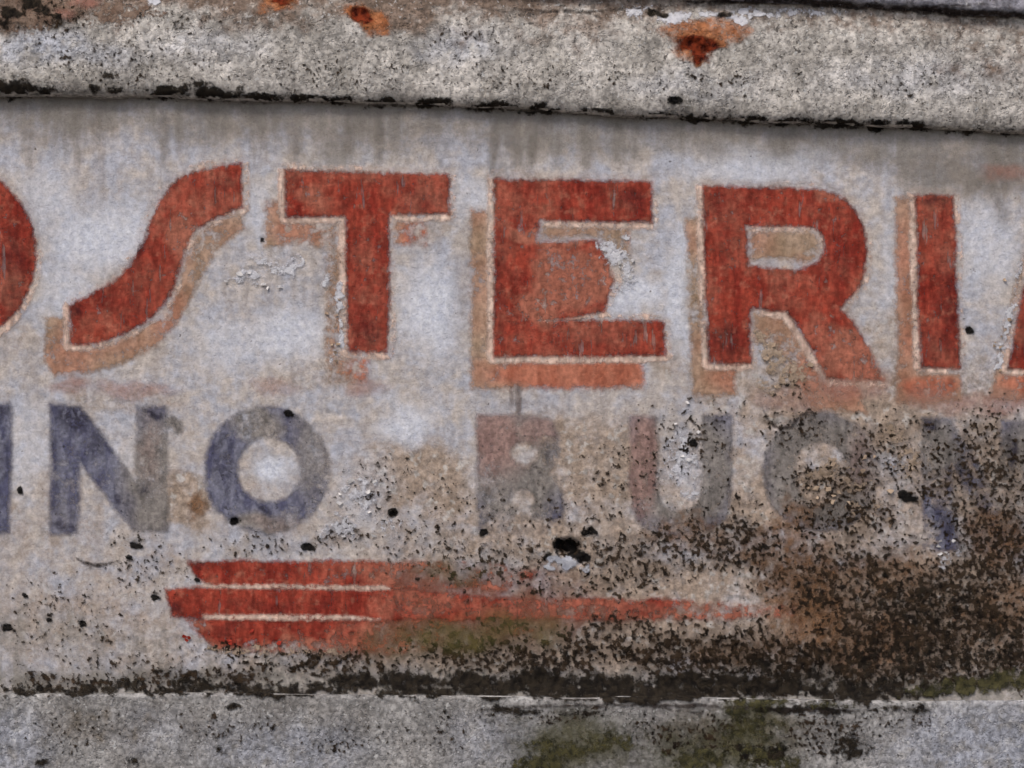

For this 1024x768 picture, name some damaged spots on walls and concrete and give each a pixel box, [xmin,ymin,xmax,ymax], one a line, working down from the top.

rust [344,4,389,36]
rust [661,18,751,67]
peeling [224,255,305,290]
peeling [595,234,638,293]
leakage [0,374,1024,766]
hole [542,525,598,573]